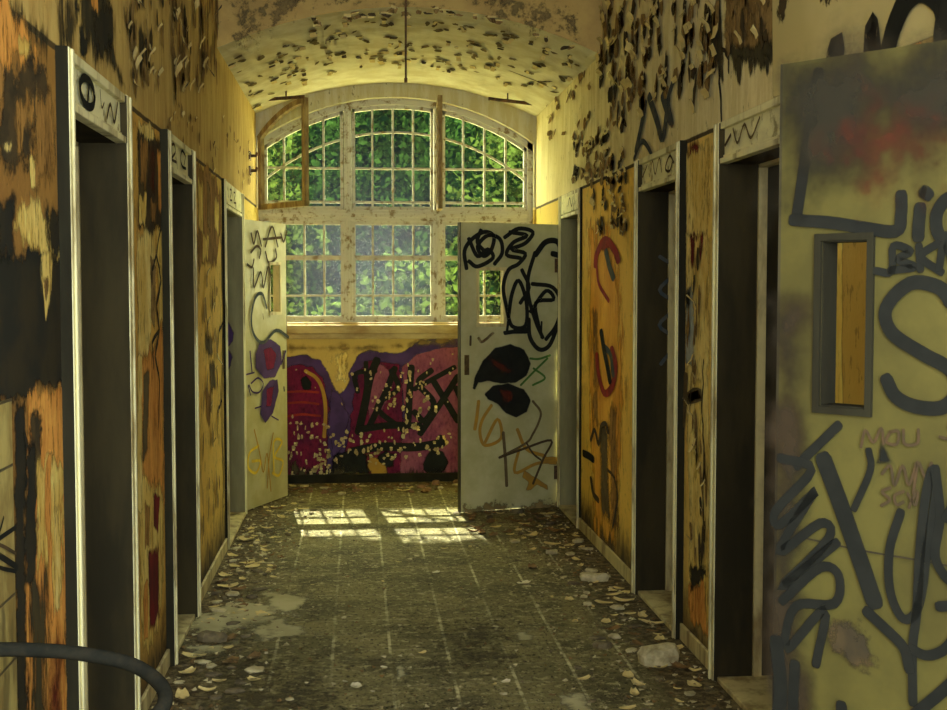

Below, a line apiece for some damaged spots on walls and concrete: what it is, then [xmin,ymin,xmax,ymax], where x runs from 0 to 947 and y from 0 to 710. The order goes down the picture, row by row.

peeling [0,0,60,319]